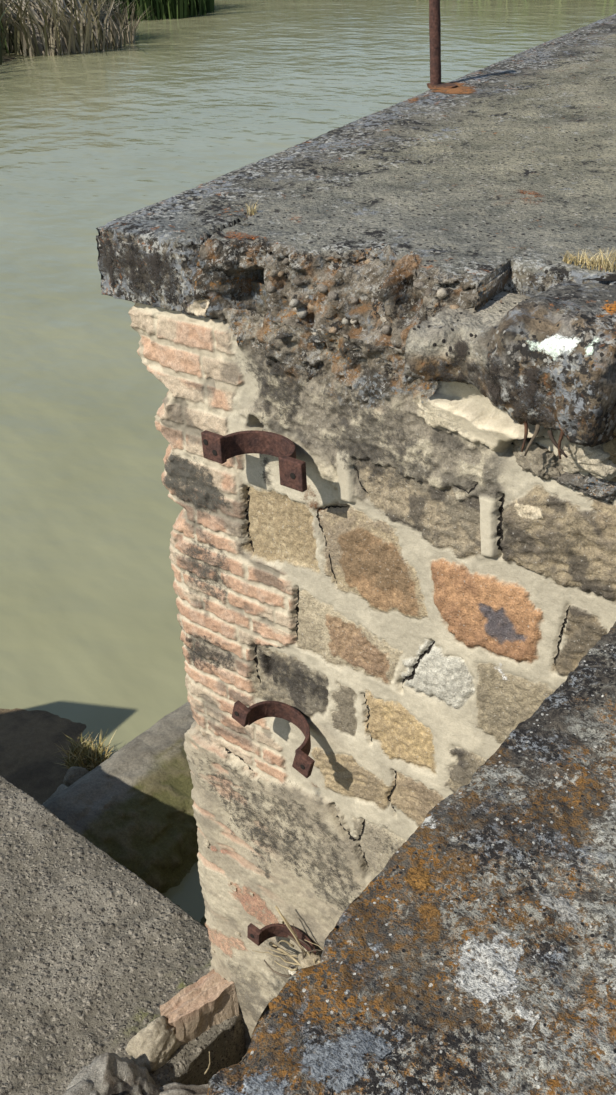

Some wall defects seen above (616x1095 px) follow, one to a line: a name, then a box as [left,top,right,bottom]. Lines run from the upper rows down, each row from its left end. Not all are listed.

rust [411,82,475,103]
crack [583,274,616,282]
spalling [187,235,511,354]